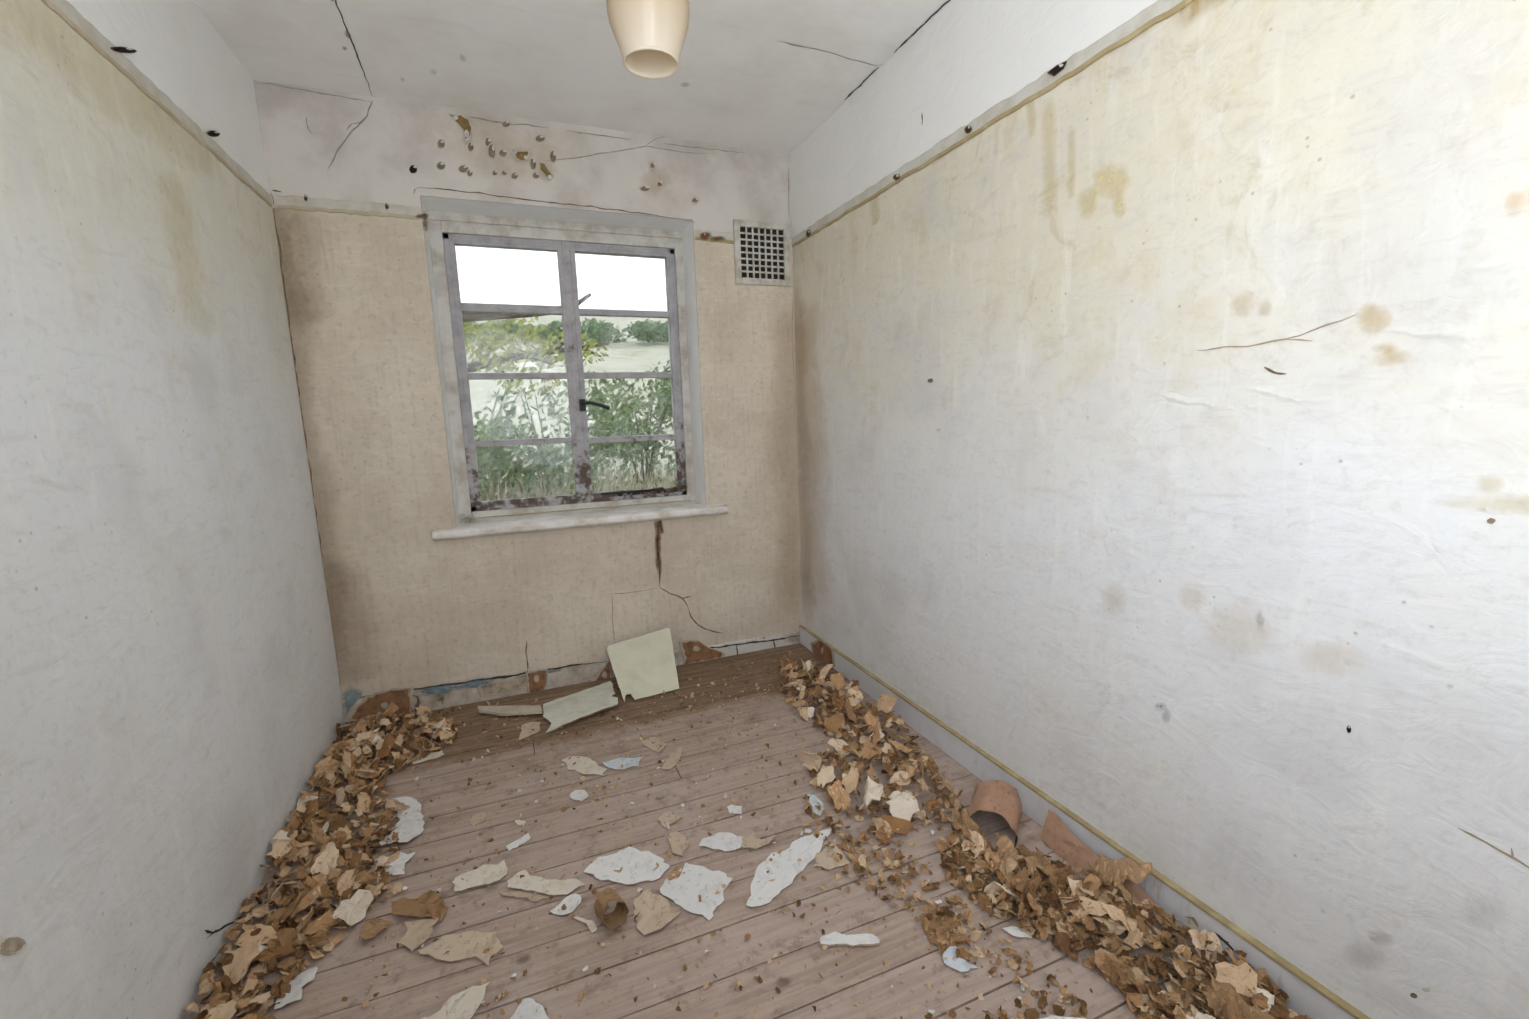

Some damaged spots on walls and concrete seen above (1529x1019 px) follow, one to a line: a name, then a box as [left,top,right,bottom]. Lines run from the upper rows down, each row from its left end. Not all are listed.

crack [256,0,373,168]
flaking render [679,639,726,665]
flaking render [590,659,612,682]